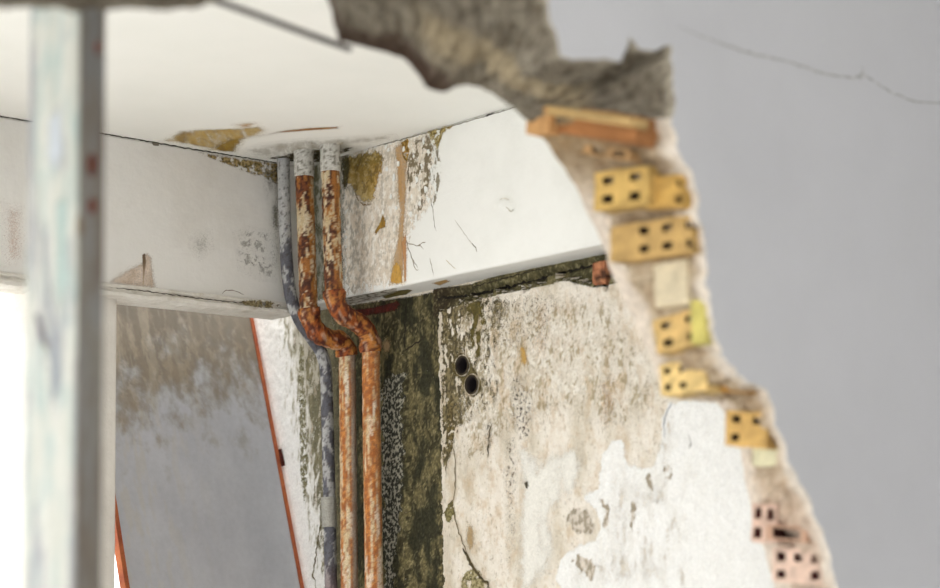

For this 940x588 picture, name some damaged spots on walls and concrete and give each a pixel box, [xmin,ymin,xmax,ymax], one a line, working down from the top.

spalling [0,0,216,13]
crack [678,26,940,104]
damp [165,122,384,301]
rust [389,139,410,286]
rust [355,301,400,316]
damp [383,289,411,298]
spalling [328,0,838,588]